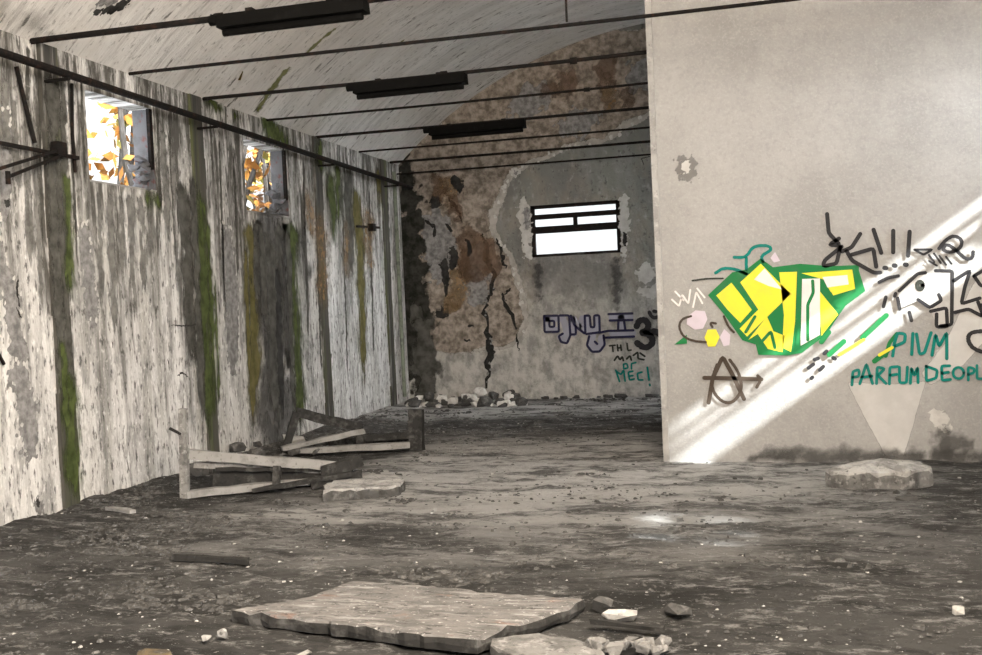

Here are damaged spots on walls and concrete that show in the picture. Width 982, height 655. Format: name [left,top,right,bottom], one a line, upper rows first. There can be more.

water stain [96,113,323,444]
water stain [316,139,355,371]
crack [425,197,520,389]
flaking render [399,27,649,354]
peeling [634,261,657,303]